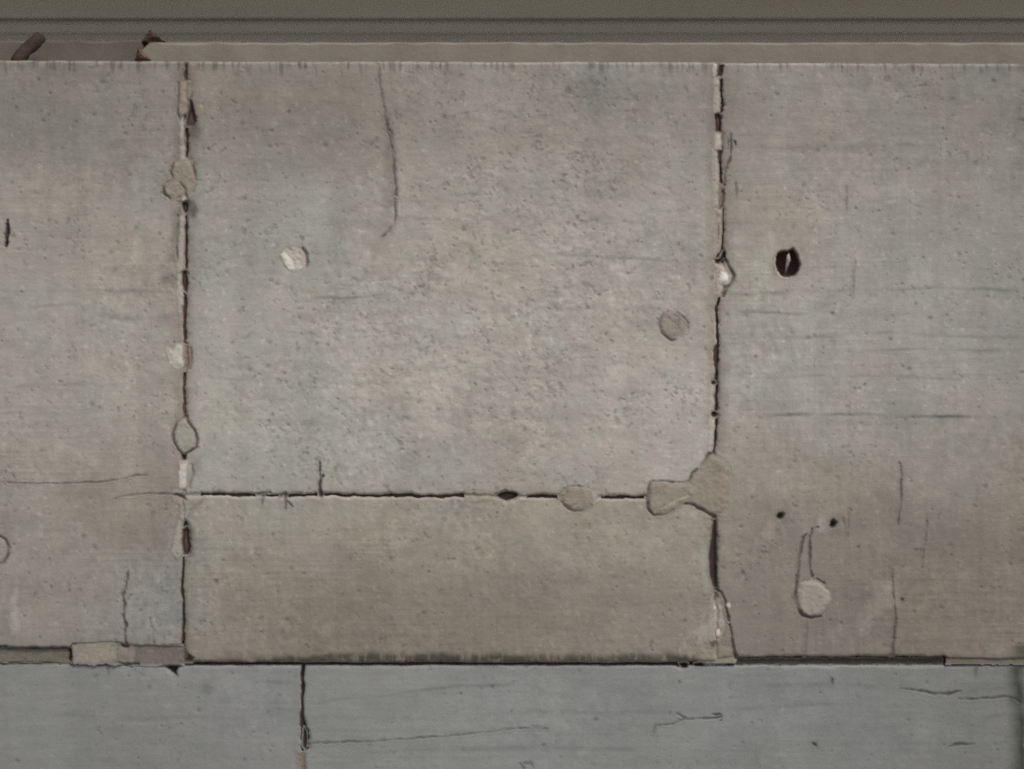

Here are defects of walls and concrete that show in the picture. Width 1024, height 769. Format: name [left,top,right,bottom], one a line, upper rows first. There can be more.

crack [174,82,182,122]
crack [376,62,399,239]
crack [161,162,198,261]
crack [716,132,739,242]
crack [187,345,195,371]
crack [255,491,294,511]
crack [558,485,586,514]
crack [791,508,850,661]
crack [713,588,739,660]